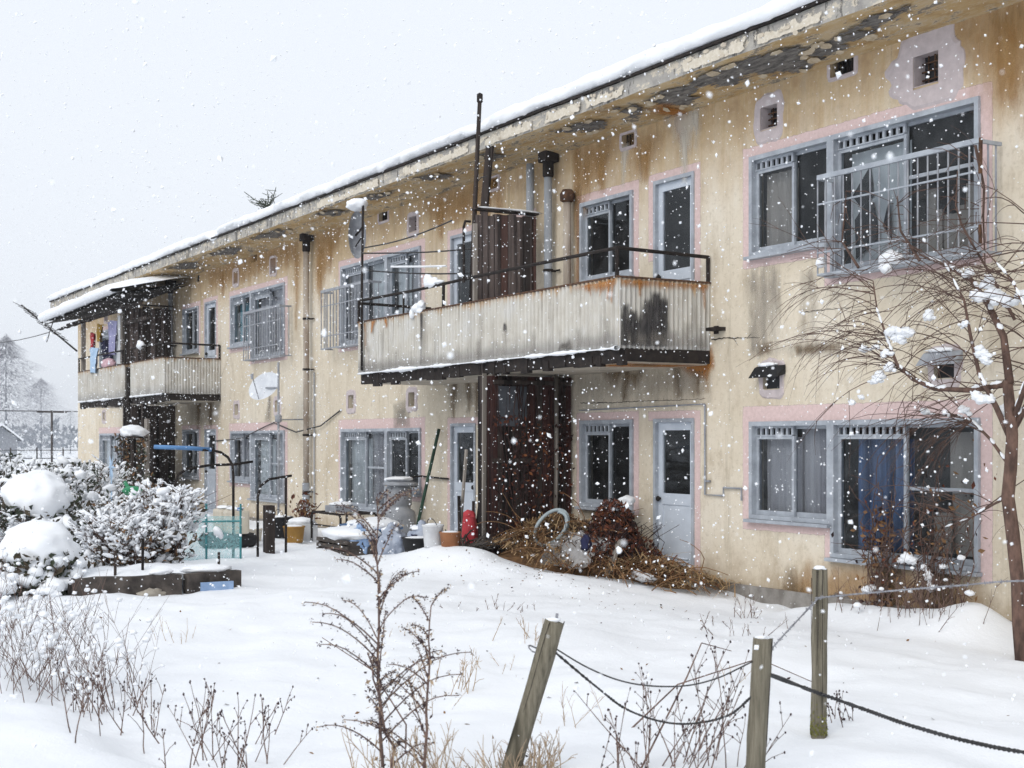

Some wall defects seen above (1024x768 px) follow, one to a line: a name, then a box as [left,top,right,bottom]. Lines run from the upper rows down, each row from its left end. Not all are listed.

spalling [402,5,912,182]
corrosion [584,280,708,304]
water stain [621,293,668,346]